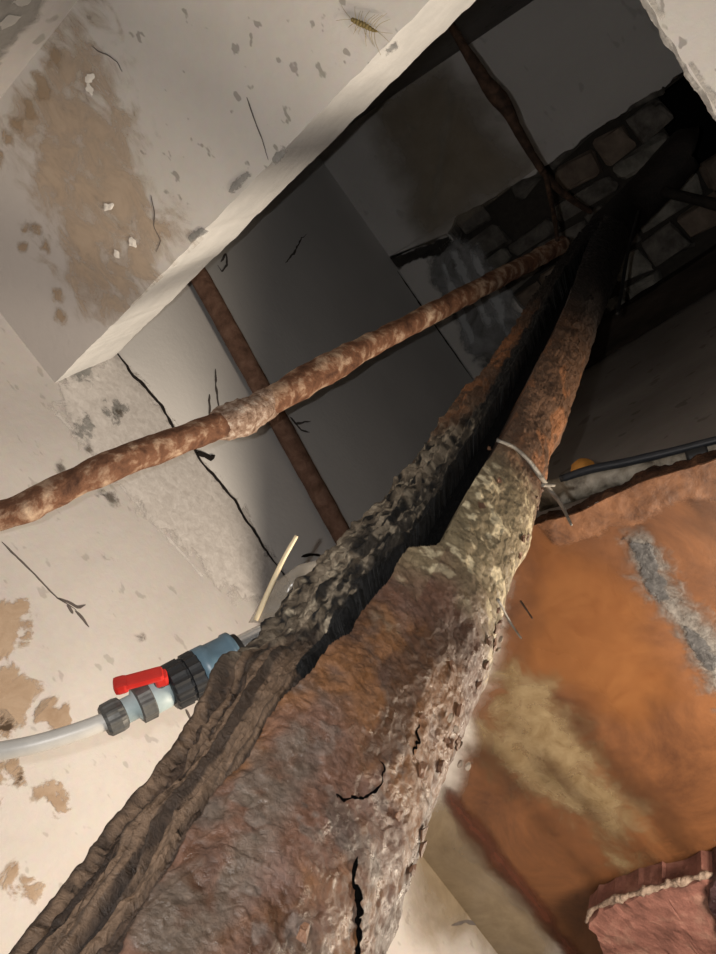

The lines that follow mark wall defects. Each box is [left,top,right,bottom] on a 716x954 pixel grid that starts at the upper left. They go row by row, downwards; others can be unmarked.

water stain [0,27,170,322]
crack [117,353,174,428]
rust [191,267,350,545]
water stain [453,287,521,368]
crack [194,449,292,588]
peeling [0,598,72,739]
rust [445,458,716,954]
water stain [625,535,716,692]
peeling [0,862,46,904]
peeling [0,758,69,813]
crack [352,857,364,954]
rust [409,826,429,877]